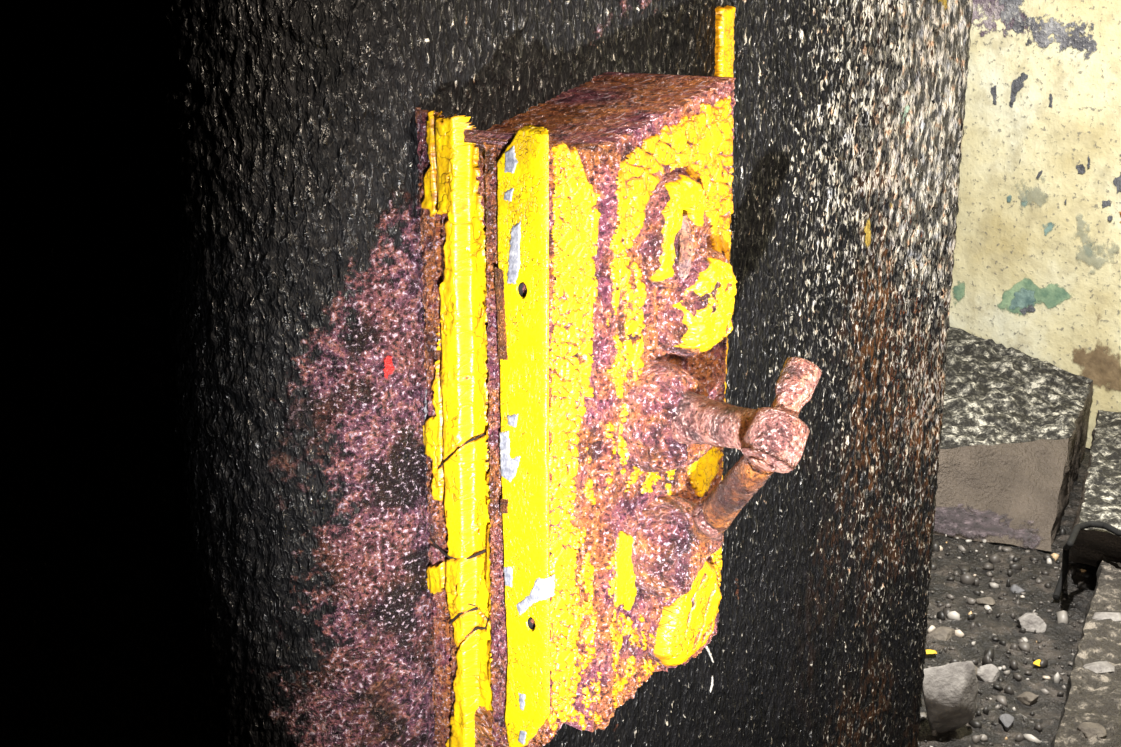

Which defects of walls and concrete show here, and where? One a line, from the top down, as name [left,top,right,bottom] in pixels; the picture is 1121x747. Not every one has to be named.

spalling [971,0,1097,59]
rust [494,267,508,360]
rust [268,188,436,747]
crack [438,433,486,469]
peeling [421,111,521,747]
peeling [516,96,737,738]
rust [500,498,508,514]
crack [429,536,490,559]
crack [449,603,489,651]